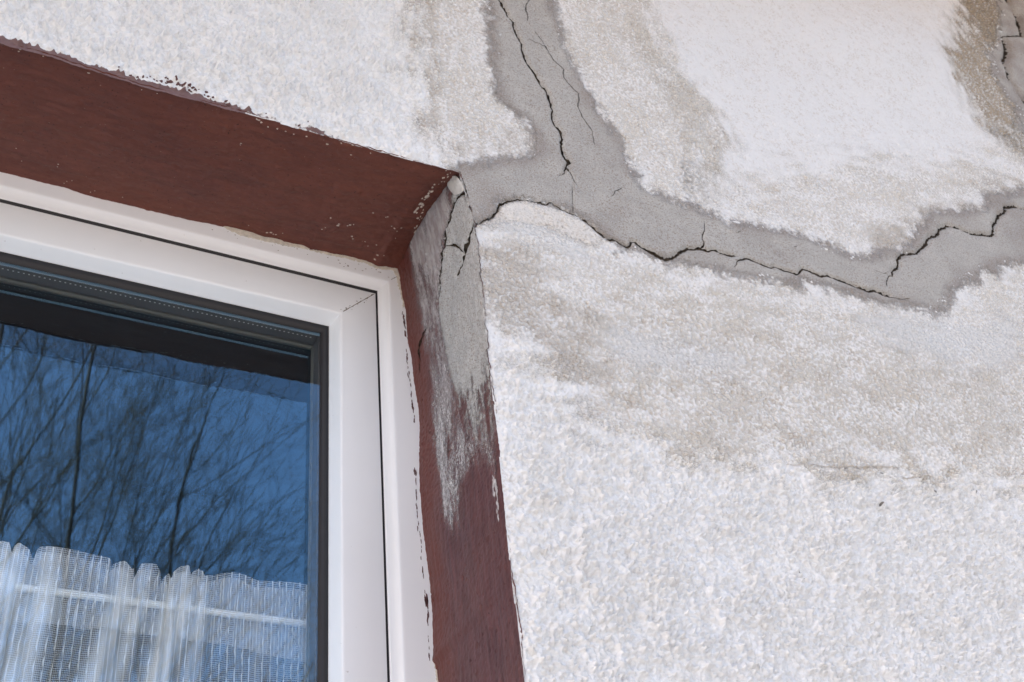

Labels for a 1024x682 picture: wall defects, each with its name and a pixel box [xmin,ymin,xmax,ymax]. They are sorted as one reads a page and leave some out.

crack [439,0,1017,299]
crack [1000,0,1024,104]
peeling [373,170,494,524]